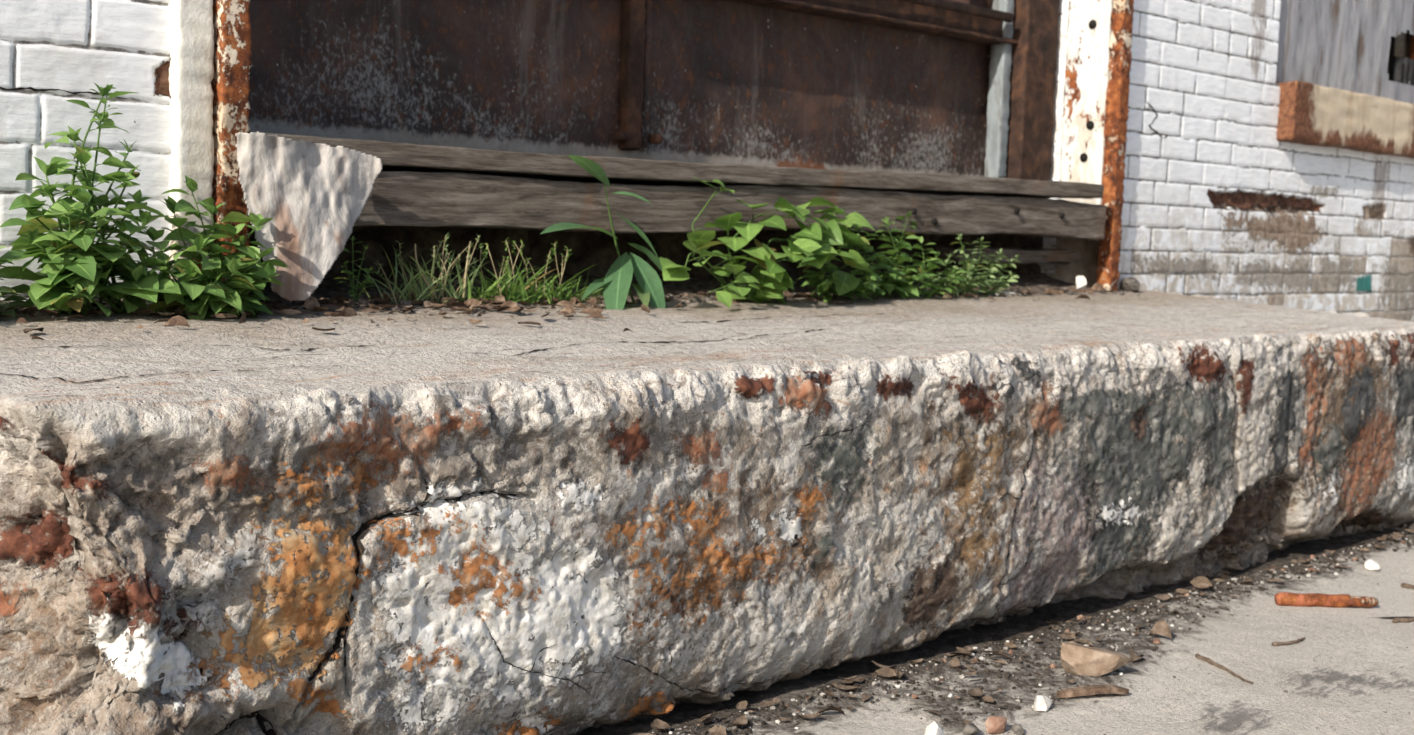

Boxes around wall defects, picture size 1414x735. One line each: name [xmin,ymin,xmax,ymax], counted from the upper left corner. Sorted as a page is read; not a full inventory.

spalling [1207,185,1340,215]
rust [192,401,542,622]
rust [598,417,650,477]
rust [604,425,832,649]
rust [1298,335,1370,468]
rust [1334,402,1398,529]
rust [1386,332,1414,371]
crack [216,477,522,735]
rust [380,636,467,689]